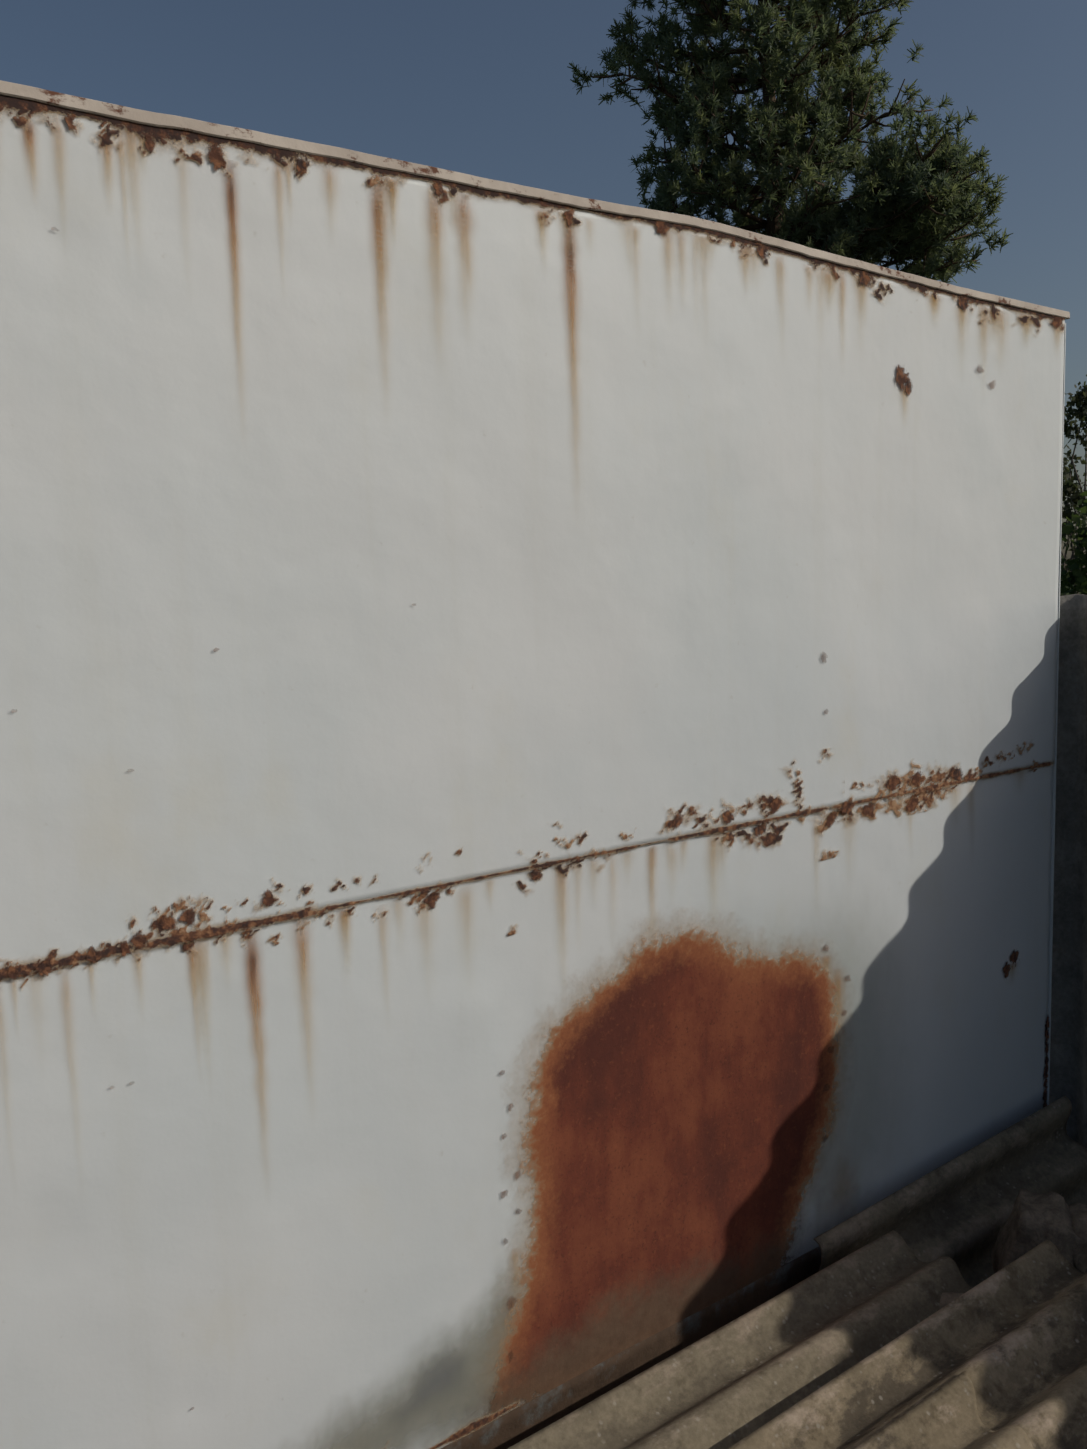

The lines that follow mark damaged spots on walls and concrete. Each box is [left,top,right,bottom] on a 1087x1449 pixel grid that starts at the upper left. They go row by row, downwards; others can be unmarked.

corrosion [0,95,1065,355]
corrosion [896,365,913,396]
corrosion [0,742,1053,1031]
corrosion [430,927,844,1449]